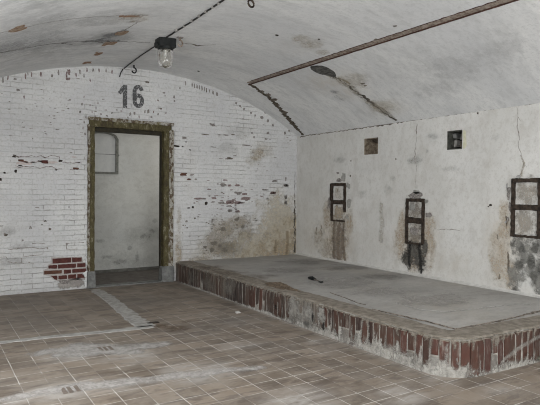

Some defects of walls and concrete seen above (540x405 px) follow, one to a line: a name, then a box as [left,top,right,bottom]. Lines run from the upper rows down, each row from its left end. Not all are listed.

peeling [12,152,80,173]
peeling [43,103,197,284]
peeling [188,179,253,236]
damp [192,195,296,261]
damp [491,185,540,295]
crack [517,104,531,174]